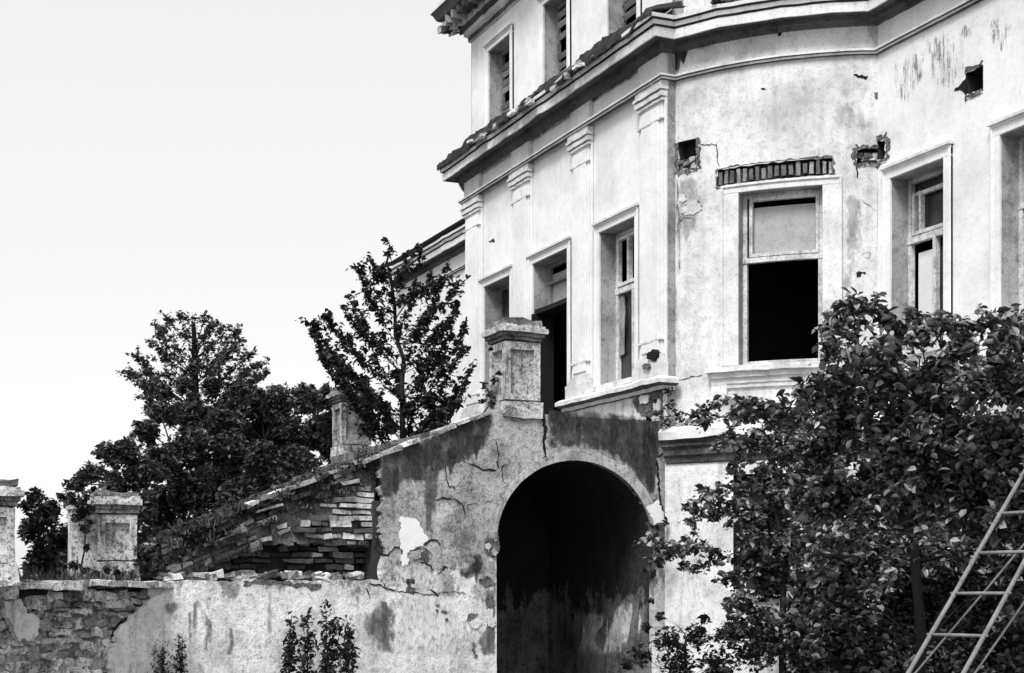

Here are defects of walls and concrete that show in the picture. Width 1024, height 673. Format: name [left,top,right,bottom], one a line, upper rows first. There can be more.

leakage [897,38,956,98]
hole [954,60,983,101]
hole [674,137,702,176]
flaking render [715,155,835,189]
spalling [851,132,891,168]
leakage [380,415,491,532]
crack [435,439,508,515]
crack [540,404,548,459]
leakage [549,410,660,493]
flaking render [8,589,48,600]
crack [366,535,464,599]
leakage [367,565,495,654]